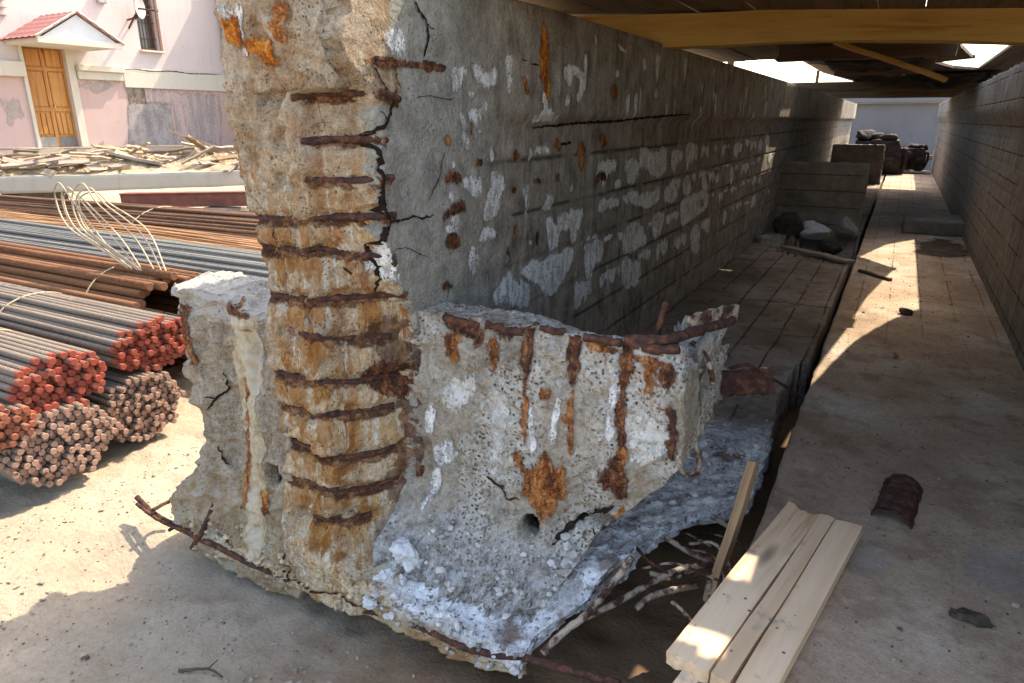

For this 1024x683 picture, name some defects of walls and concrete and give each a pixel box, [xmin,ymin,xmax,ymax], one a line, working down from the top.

rust [219,0,291,67]
crack [343,66,454,292]
water stain [445,146,506,276]
efflorescence [493,67,773,310]
crack [204,372,231,410]
rust [255,212,425,557]
efflorescence [420,373,512,512]
rust [444,312,678,525]
spalling [442,301,681,385]
spalling [134,495,291,582]
spalling [413,514,749,683]
crack [552,505,614,546]